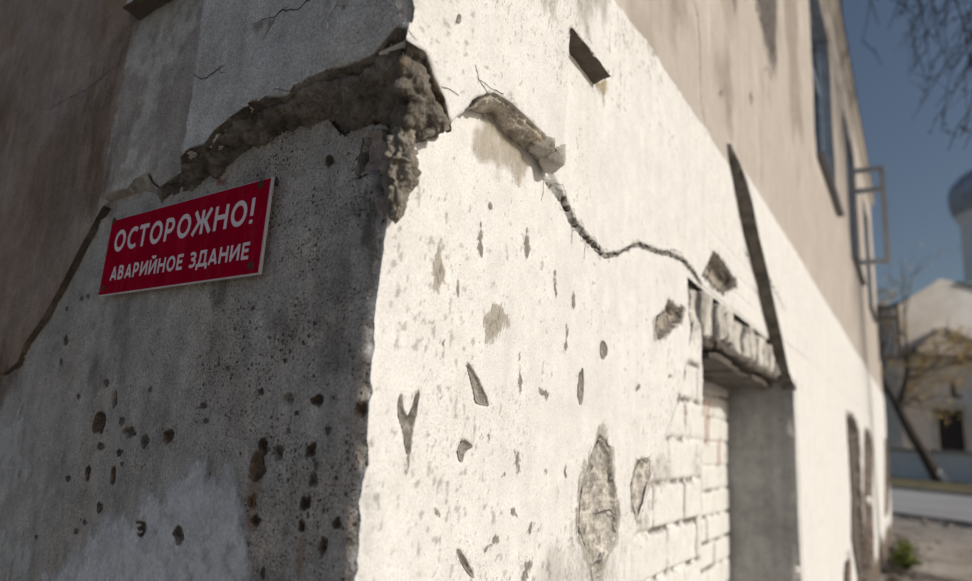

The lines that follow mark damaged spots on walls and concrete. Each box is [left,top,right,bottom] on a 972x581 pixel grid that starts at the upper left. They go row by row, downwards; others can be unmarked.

crack [252,0,310,25]
spalling [2,0,452,376]
crack [541,182,702,282]
spalling [701,252,737,296]
spalling [727,144,796,391]
spalling [574,298,704,581]